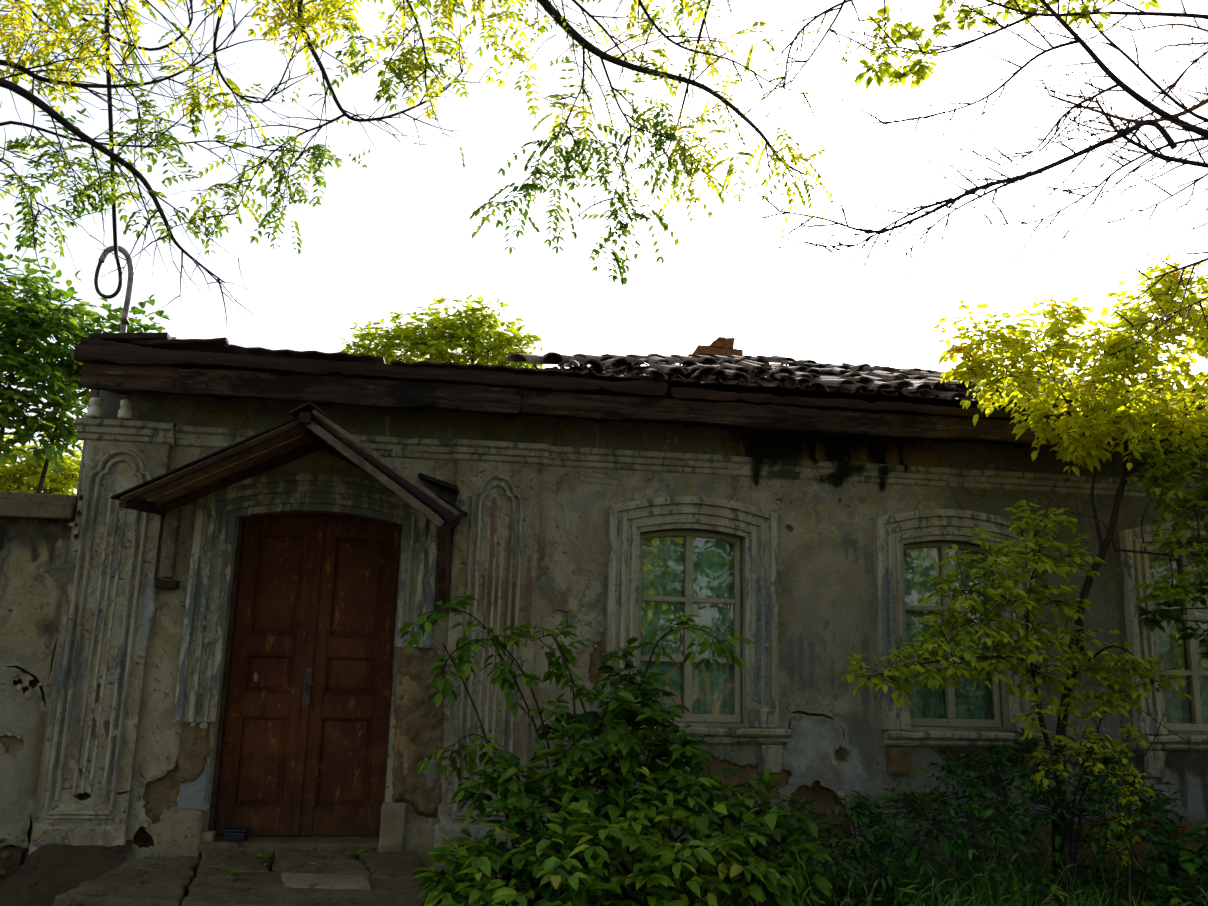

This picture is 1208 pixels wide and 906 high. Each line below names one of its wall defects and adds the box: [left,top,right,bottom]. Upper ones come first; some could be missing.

leakage [746,432,908,492]
leakage [0,520,69,562]
peeling [751,575,772,706]
peeling [877,569,896,703]
flaking render [0,730,24,759]
flaking render [131,758,210,849]
peeling [700,710,873,857]
crack [788,710,844,737]